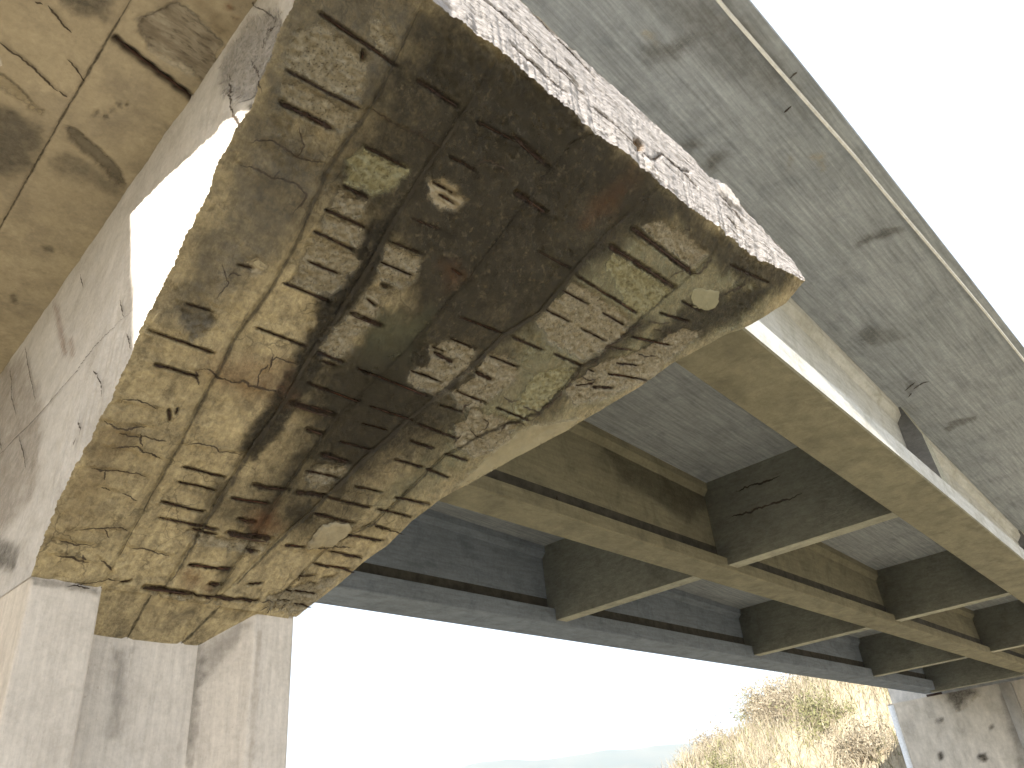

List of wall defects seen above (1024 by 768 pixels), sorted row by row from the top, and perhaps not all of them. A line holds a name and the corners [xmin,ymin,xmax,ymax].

crack [227,3,320,213]
spalling [633,141,660,179]
spalling [428,178,464,210]
damp [229,0,790,529]
crack [195,356,296,397]
crack [91,371,241,501]
crack [732,476,802,517]
crack [58,527,169,589]
spalling [143,513,385,612]